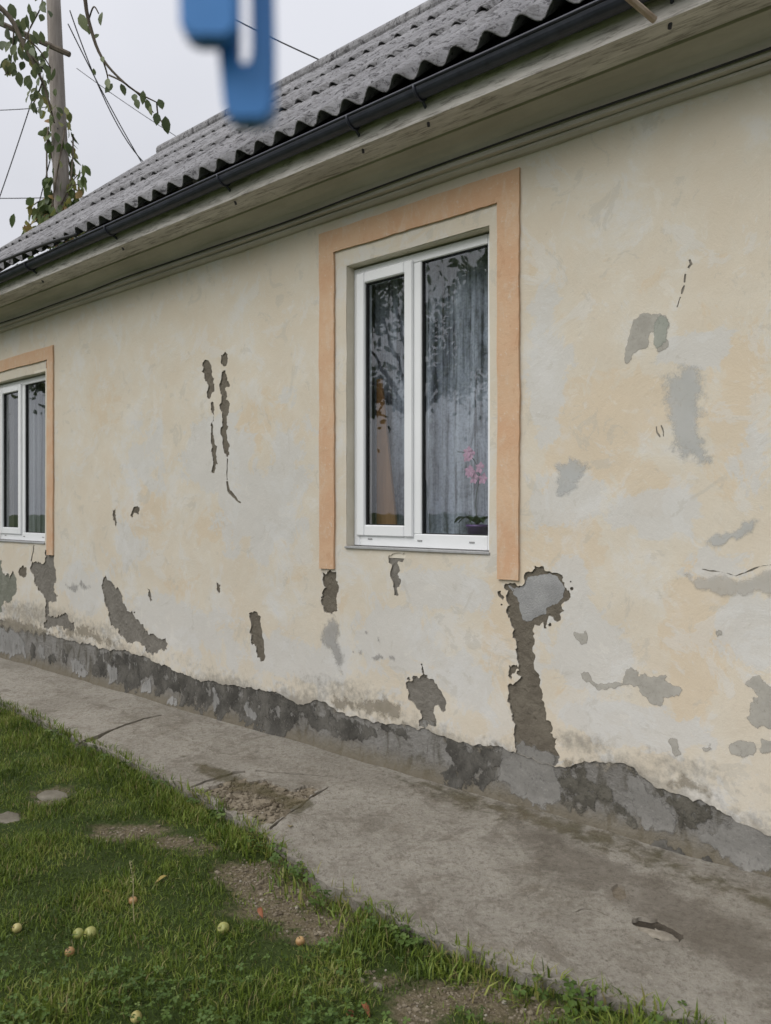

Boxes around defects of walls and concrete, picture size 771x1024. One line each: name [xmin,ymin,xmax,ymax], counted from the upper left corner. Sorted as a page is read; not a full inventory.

crack [677,259,692,307]
peeling [624,313,669,364]
spalling [202,352,241,503]
spalling [0,545,75,631]
spalling [388,553,404,596]
crack [702,565,767,576]
peeling [92,570,410,742]
spalling [406,664,446,728]
spalling [498,566,573,756]
peeling [581,668,682,706]
peeling [729,675,771,758]
peeling [440,738,502,791]